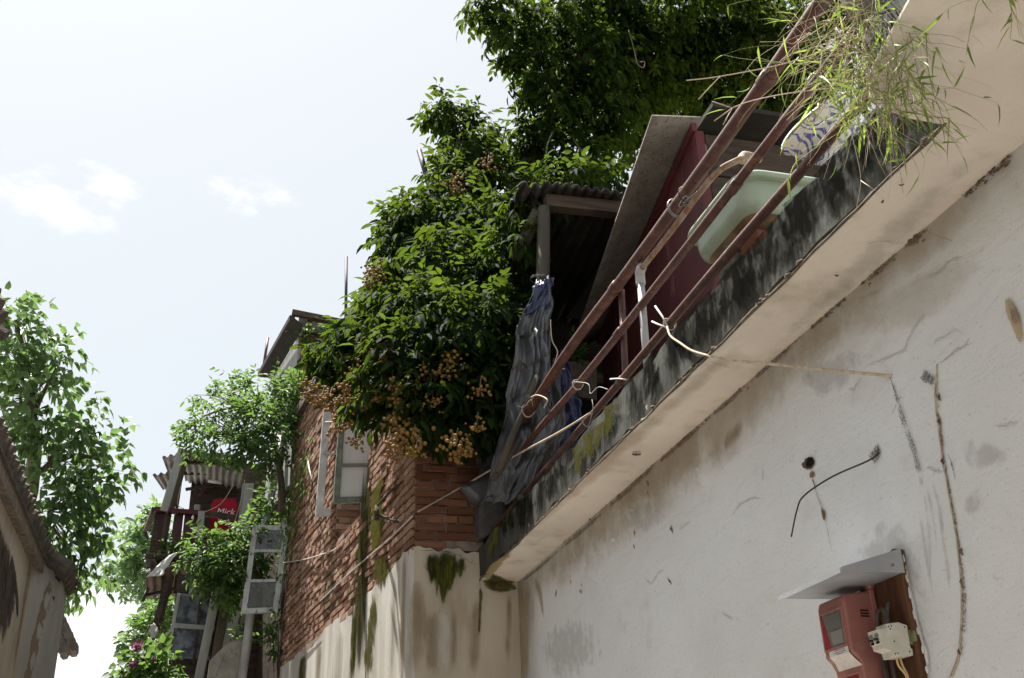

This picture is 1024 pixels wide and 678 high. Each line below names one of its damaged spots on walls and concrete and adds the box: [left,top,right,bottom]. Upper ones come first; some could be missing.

leakage [626,109,921,414]
peeling [24,582,51,678]
leakage [335,464,454,675]
leakage [428,556,464,603]
leakage [472,412,613,673]